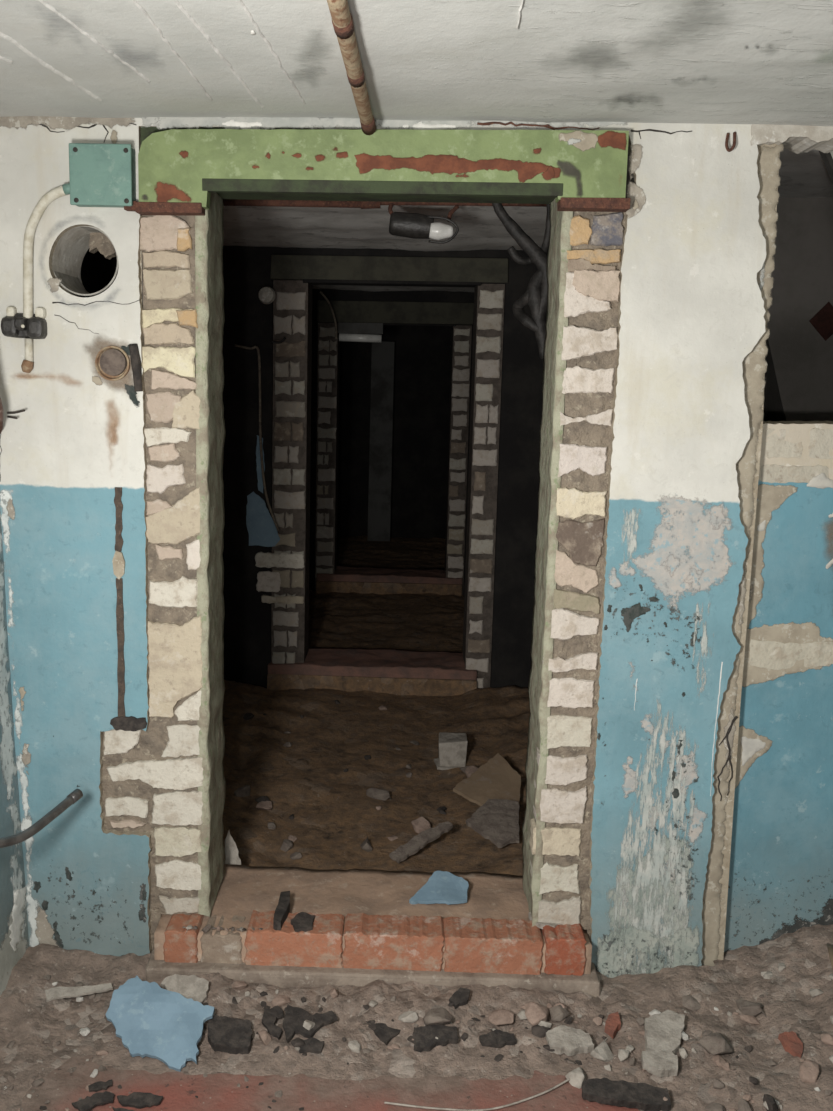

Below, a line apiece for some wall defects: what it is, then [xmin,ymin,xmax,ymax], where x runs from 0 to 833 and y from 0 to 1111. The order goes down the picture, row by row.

rust [252,147,582,196]
peeling [596,144,833,978]
rust [825,513,833,569]
flaking render [0,490,147,995]
crack [717,716,738,801]